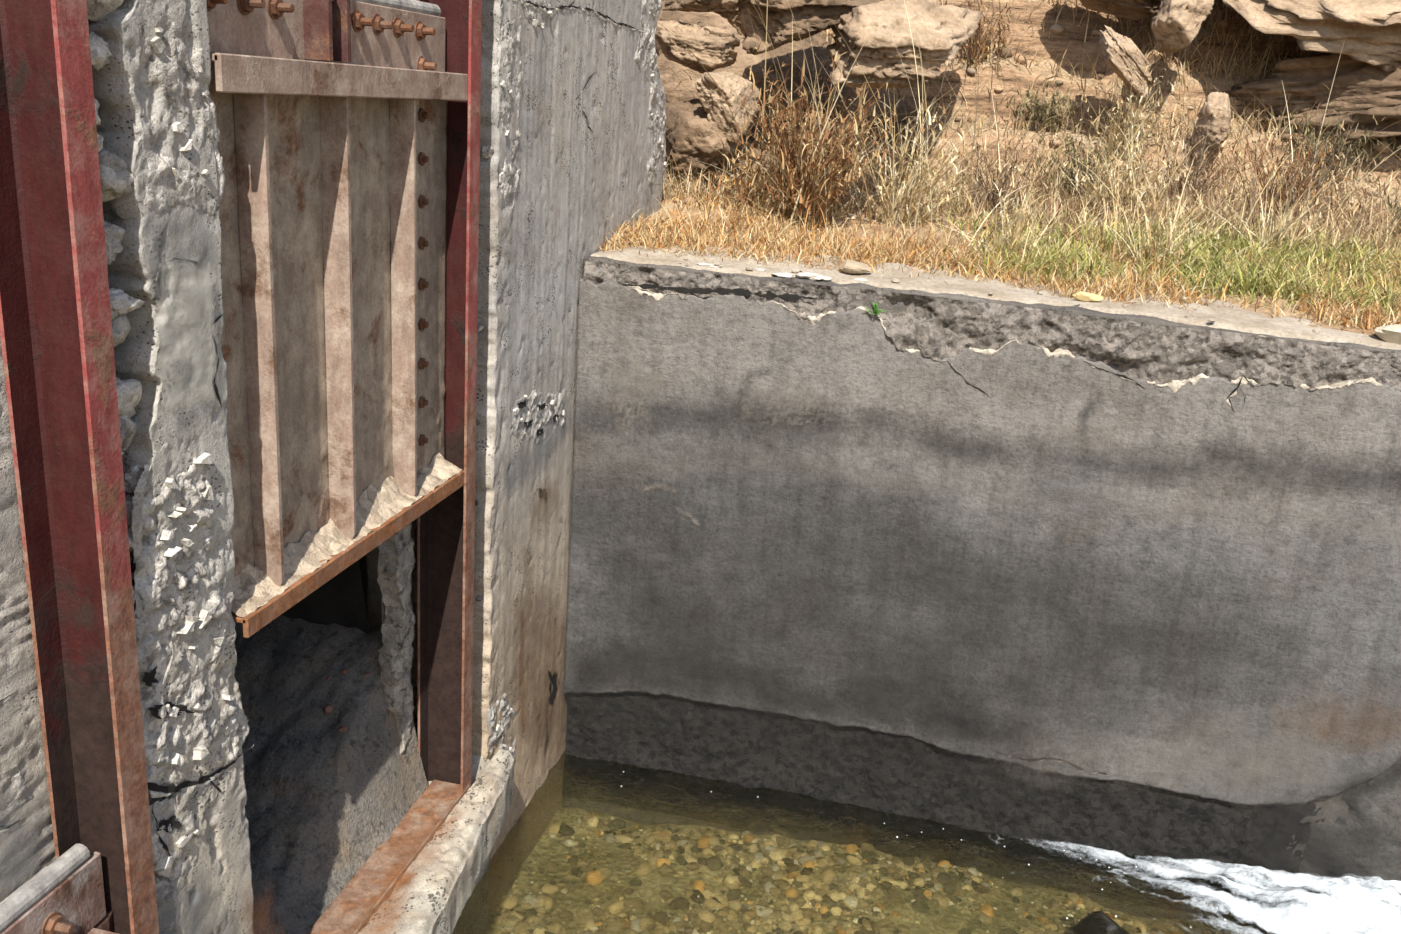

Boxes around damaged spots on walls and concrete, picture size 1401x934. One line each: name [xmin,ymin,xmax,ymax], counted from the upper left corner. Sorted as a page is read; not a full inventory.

crack [513,0,643,33]
spalling [87,0,225,217]
spalling [104,221,125,265]
spalling [109,288,145,347]
peeling [212,295,223,406]
spalling [583,261,1401,393]
spalling [508,389,567,446]
crack [0,818,25,833]
damp [1269,811,1377,881]